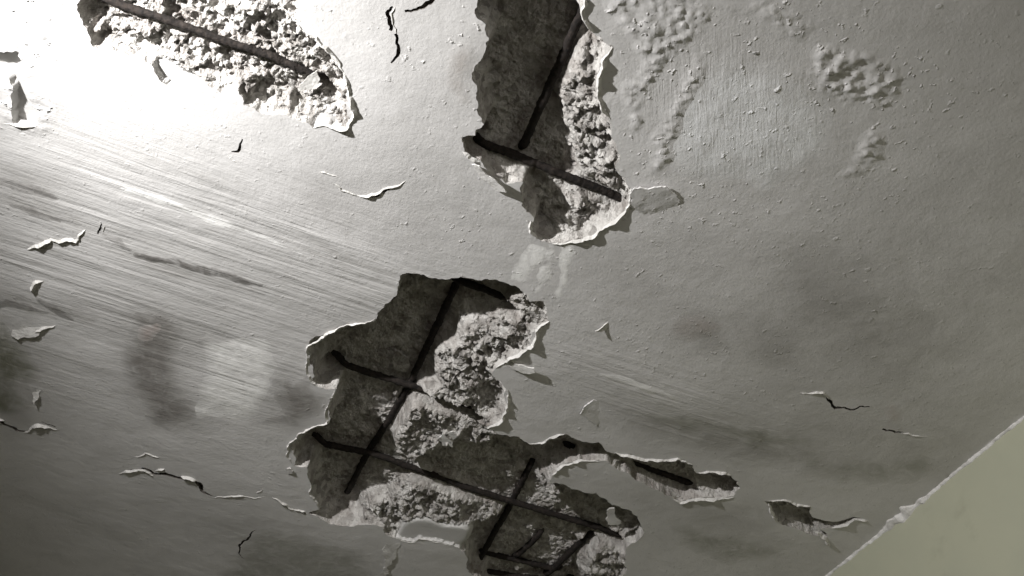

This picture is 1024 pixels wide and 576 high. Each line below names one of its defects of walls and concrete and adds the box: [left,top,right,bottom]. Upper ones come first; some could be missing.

crack [385,0,435,63]
spalling [77,0,358,132]
spalling [461,0,680,245]
peeling [27,230,85,250]
peeling [11,326,54,340]
spalling [286,273,740,576]
crack [800,391,870,411]
crack [119,452,306,514]
spalling [765,499,868,547]